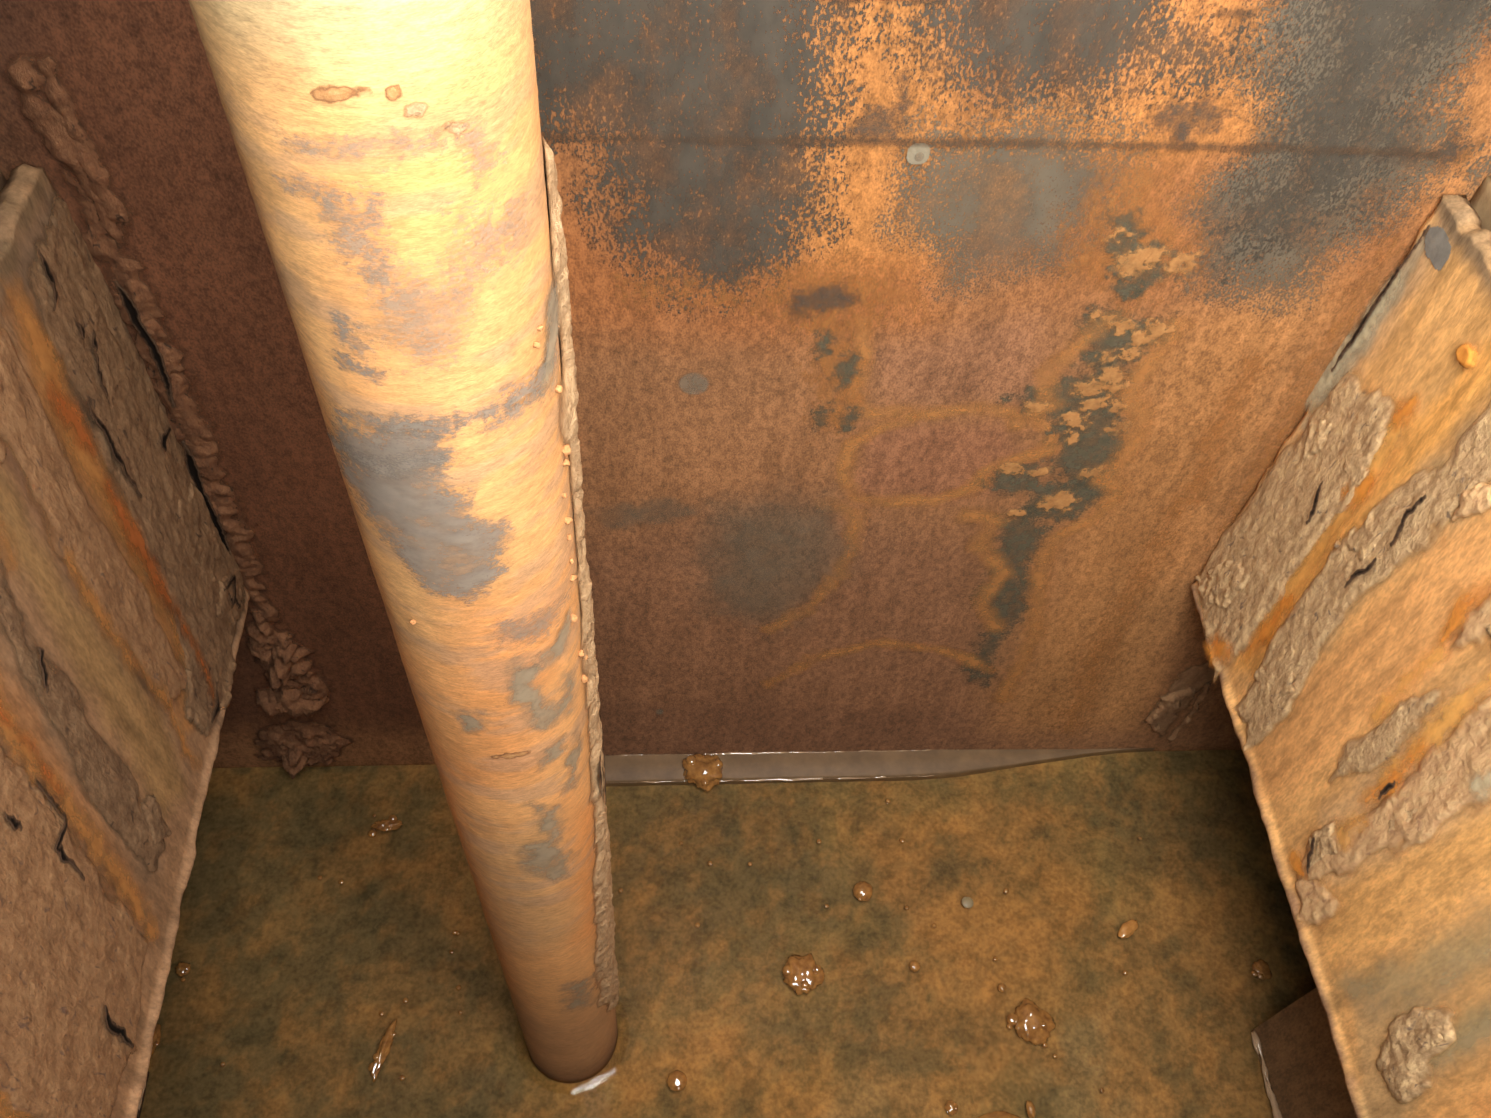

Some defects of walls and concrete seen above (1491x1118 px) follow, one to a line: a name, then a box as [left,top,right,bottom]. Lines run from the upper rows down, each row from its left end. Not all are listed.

rust [0,55,353,779]
leakage [272,175,527,386]
leakage [327,284,558,604]
rust [541,135,619,1012]
rust [811,322,864,433]
leakage [530,0,1491,702]
crack [1306,481,1323,525]
rust [1145,372,1491,752]
crack [1344,494,1426,588]
crack [4,778,85,881]
rust [0,543,172,1118]
crack [104,1005,134,1049]